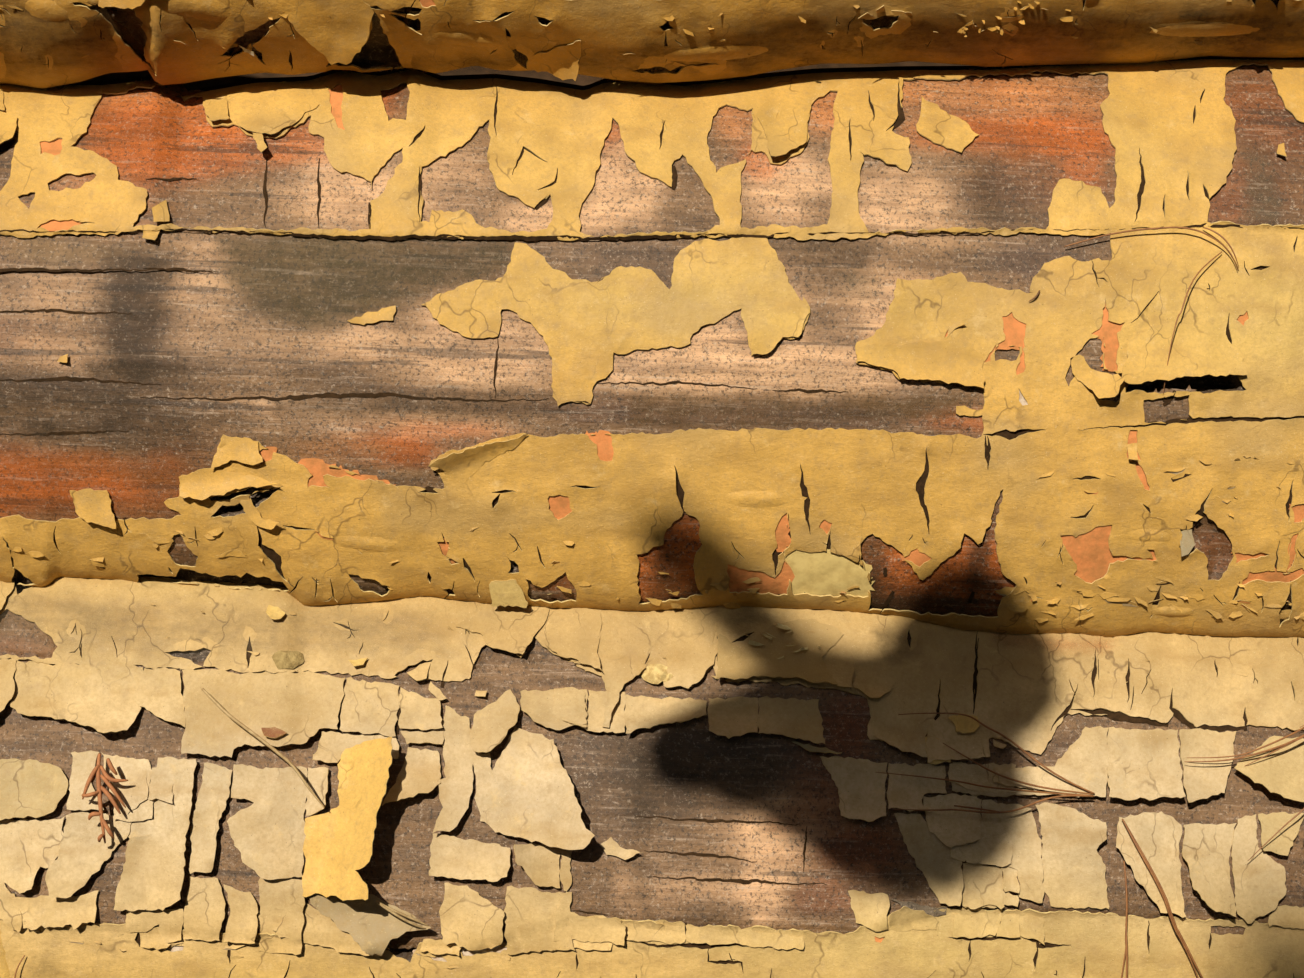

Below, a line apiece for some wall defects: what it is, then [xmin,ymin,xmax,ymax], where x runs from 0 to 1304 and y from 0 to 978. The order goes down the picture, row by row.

peeling [1207,58,1304,226]
crack [0,122,1243,241]
peeling [0,0,1117,571]
crack [0,338,549,402]
crack [598,353,847,393]
crack [1084,390,1304,430]
crack [983,429,1044,466]
crack [257,525,363,654]
crack [1051,650,1258,732]
crack [636,816,827,885]
crack [572,910,784,978]
crack [949,921,1085,978]